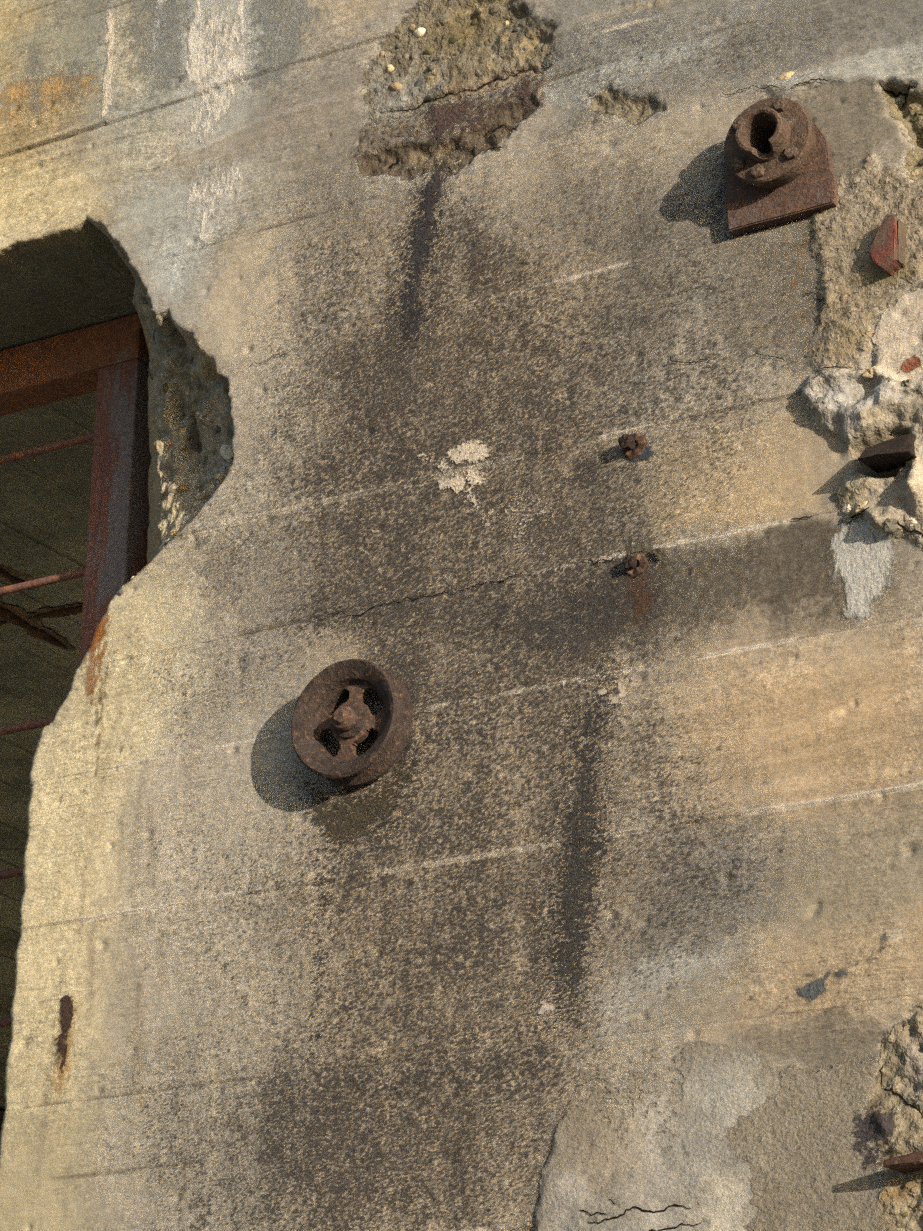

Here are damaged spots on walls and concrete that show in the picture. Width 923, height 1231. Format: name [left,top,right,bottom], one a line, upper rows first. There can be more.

leakage [99,0,319,144]
spalling [354,0,557,181]
leakage [559,17,790,120]
spalling [93,220,233,601]
leakage [123,154,896,1231]
rust [54,995,76,1093]
spalling [865,1000,923,1231]
crack [580,1199,702,1231]